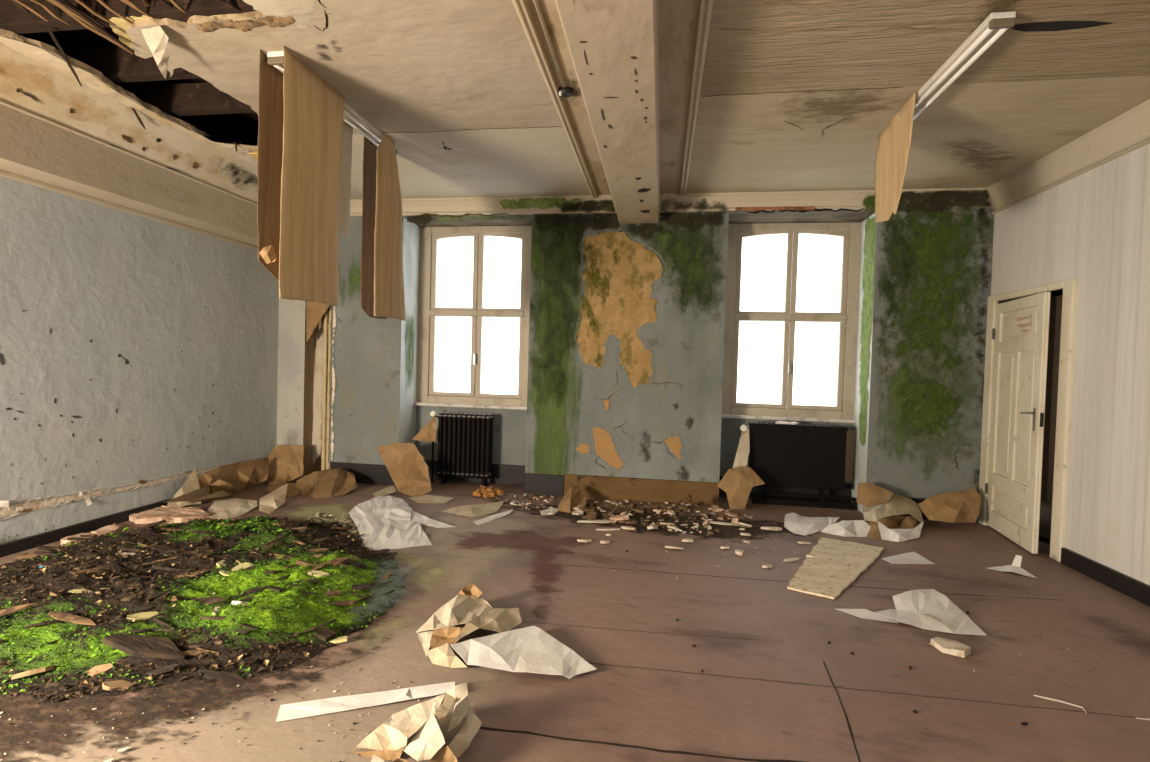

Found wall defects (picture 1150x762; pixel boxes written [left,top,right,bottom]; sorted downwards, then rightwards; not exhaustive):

flaking render [195,15,296,33]
crack [314,0,328,32]
flaking render [141,26,170,79]
flaking render [0,36,258,169]
damp [230,164,258,186]
damp [897,189,991,226]
peeling [575,229,667,391]
damp [974,307,985,363]
peeling [574,397,626,470]
peeling [661,434,683,463]